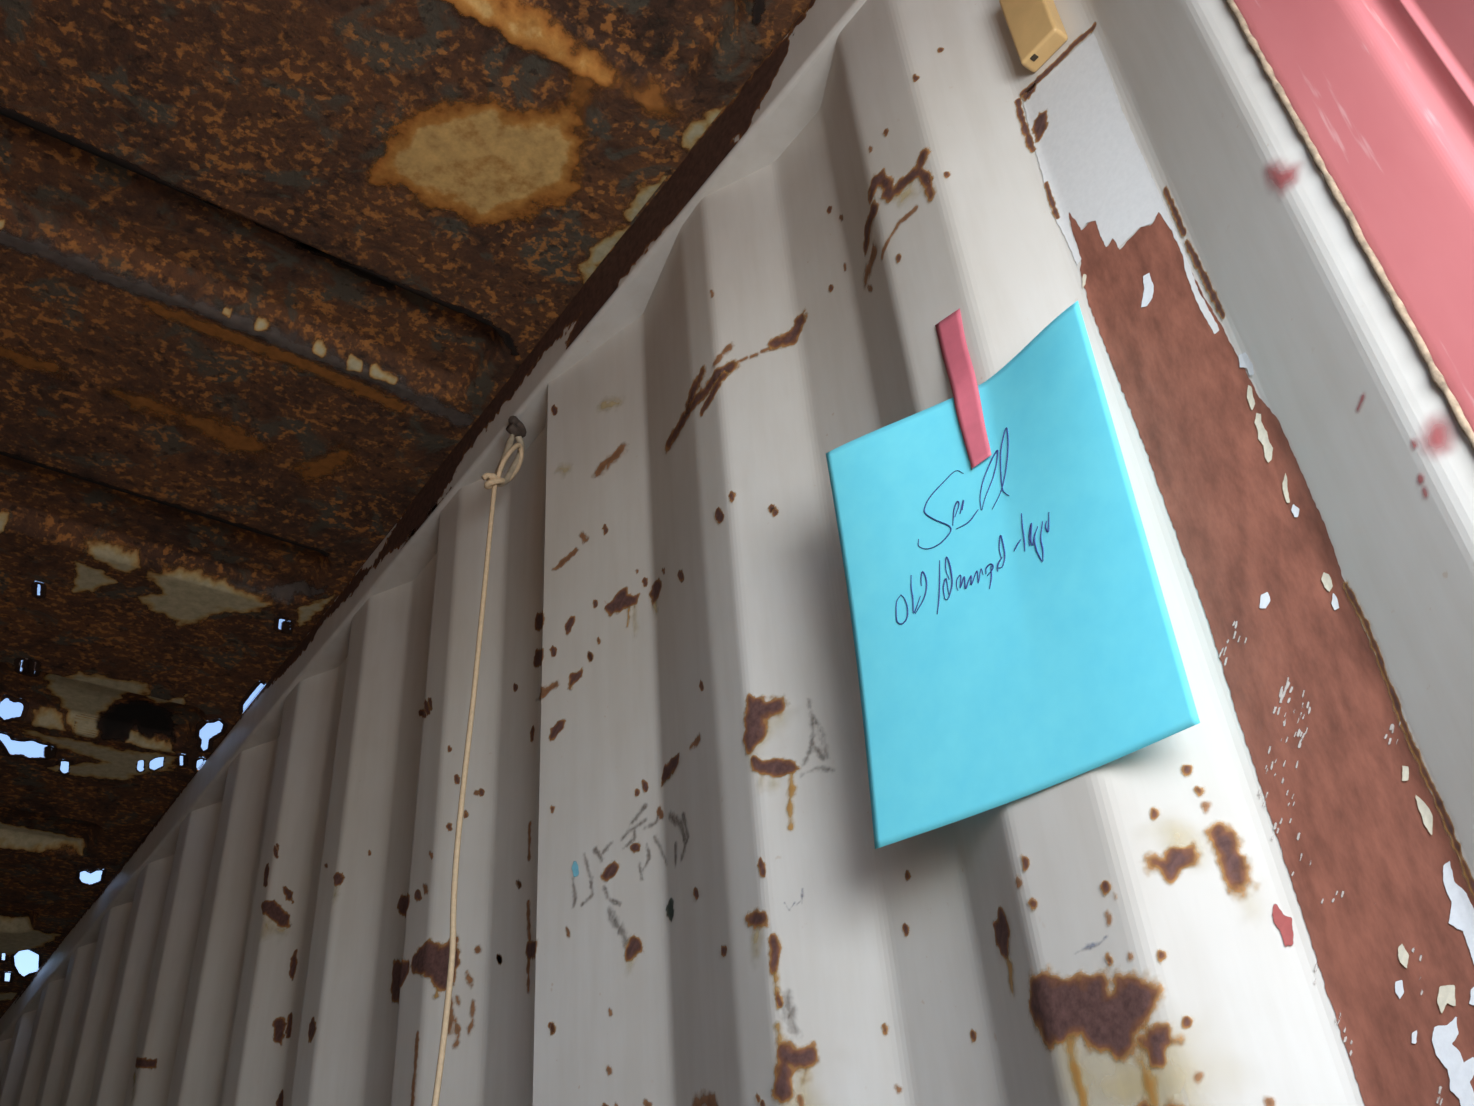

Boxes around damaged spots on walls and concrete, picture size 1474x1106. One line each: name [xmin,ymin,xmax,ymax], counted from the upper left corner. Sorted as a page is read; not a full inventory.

rust [863,148,950,292]
rust [0,0,816,1003]
rust [272,1013,316,1045]
rust [391,937,502,1047]
rust [745,908,819,1106]
rust [1016,856,1038,910]
rust [993,907,1193,1106]
rust [1100,880,1116,924]
rust [1145,765,1251,897]
peeling [1395,944,1409,999]
peeling [1412,985,1474,1106]
peeling [1443,861,1474,963]